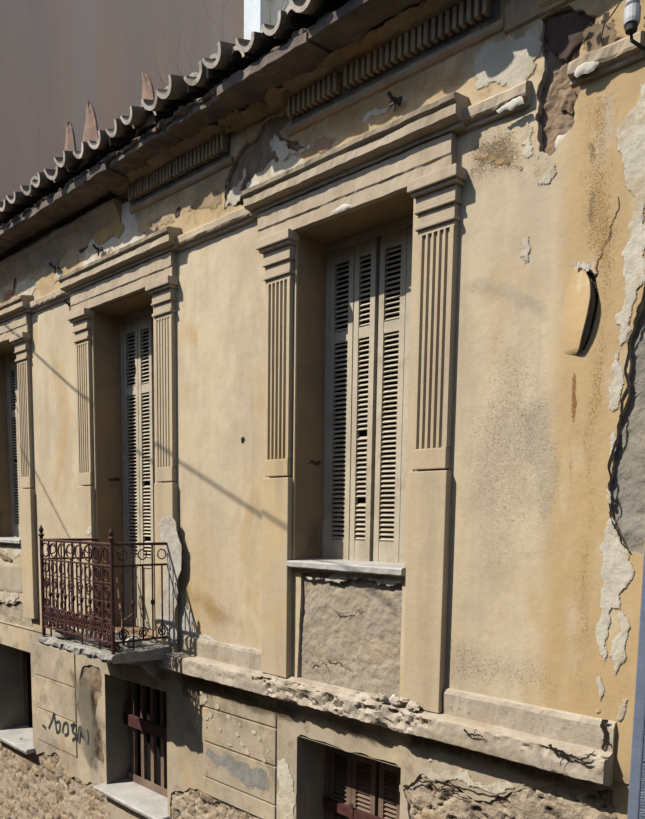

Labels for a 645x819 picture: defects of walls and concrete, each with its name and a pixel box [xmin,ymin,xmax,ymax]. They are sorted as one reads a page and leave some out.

spalling [474,9,625,185]
spalling [80,114,336,266]
crack [594,197,620,281]
spalling [595,82,645,674]
crack [607,290,645,554]
flaking render [158,516,218,651]
spalling [77,665,108,765]
crack [403,780,468,799]
crack [548,719,610,766]